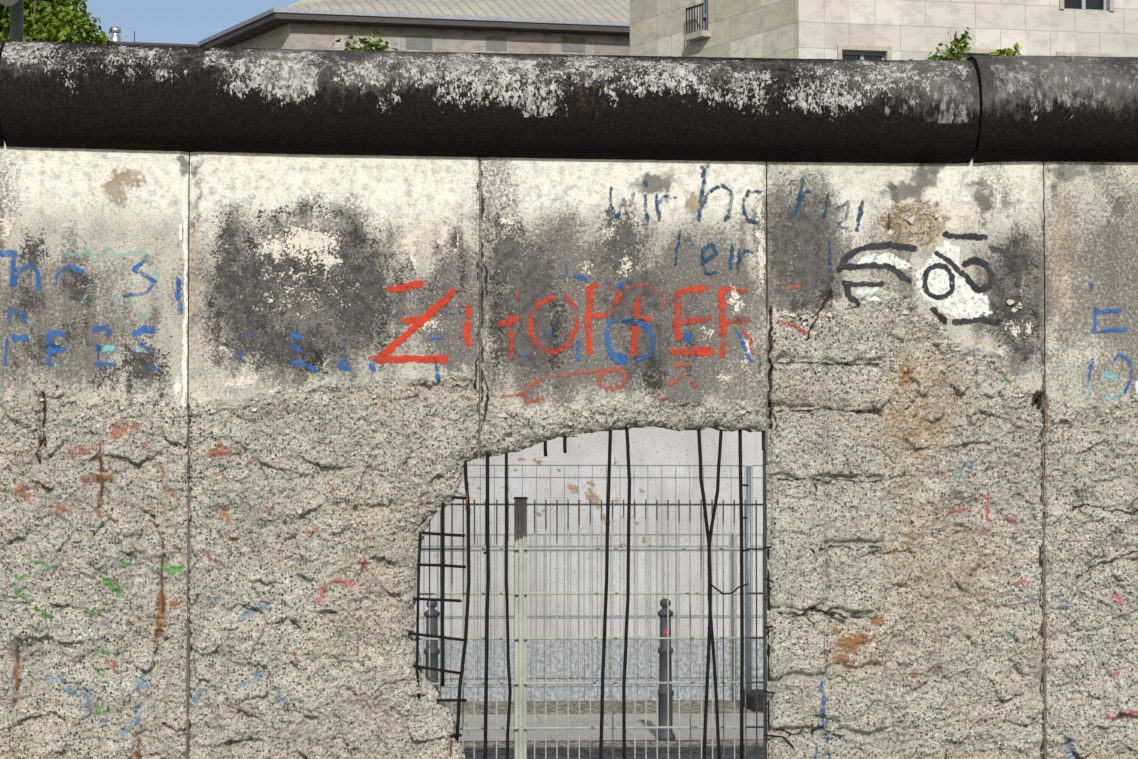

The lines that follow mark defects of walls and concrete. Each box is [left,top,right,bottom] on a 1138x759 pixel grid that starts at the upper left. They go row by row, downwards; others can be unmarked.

water stain [177,156,198,177]
water stain [194,198,424,389]
water stain [435,193,715,417]
rust [80,453,114,519]
spalling [0,176,1138,759]
rust [827,617,884,675]